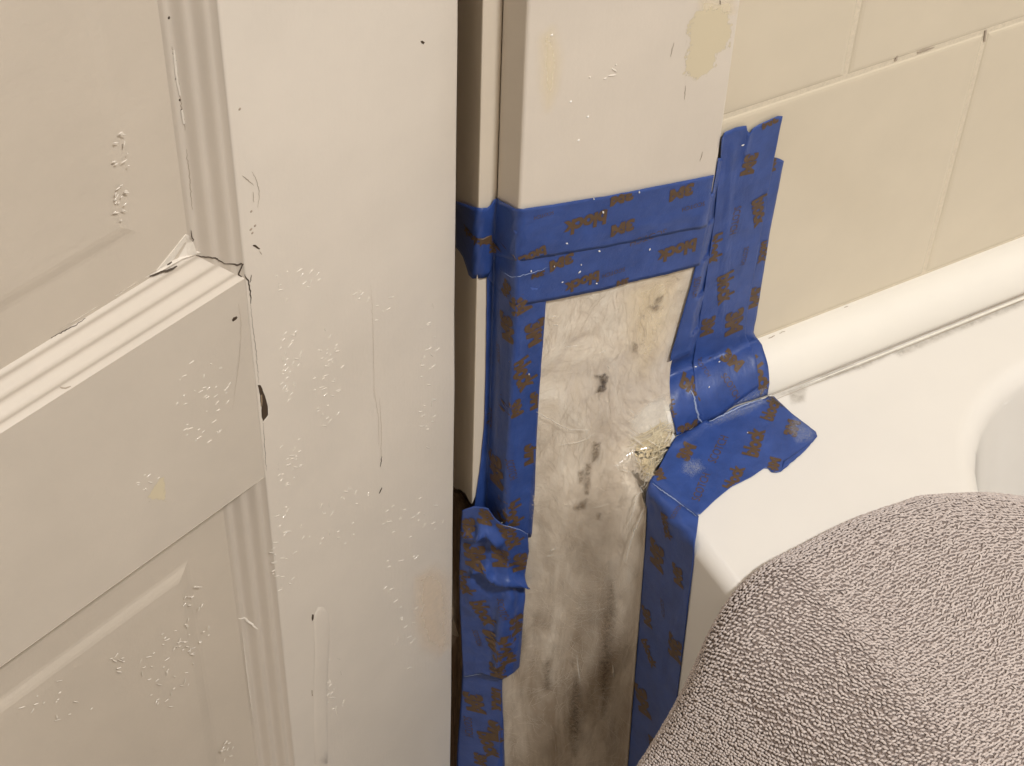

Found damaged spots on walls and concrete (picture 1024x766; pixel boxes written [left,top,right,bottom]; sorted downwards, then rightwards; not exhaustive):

crack [172,49,259,410]
peeling [258,385,269,422]